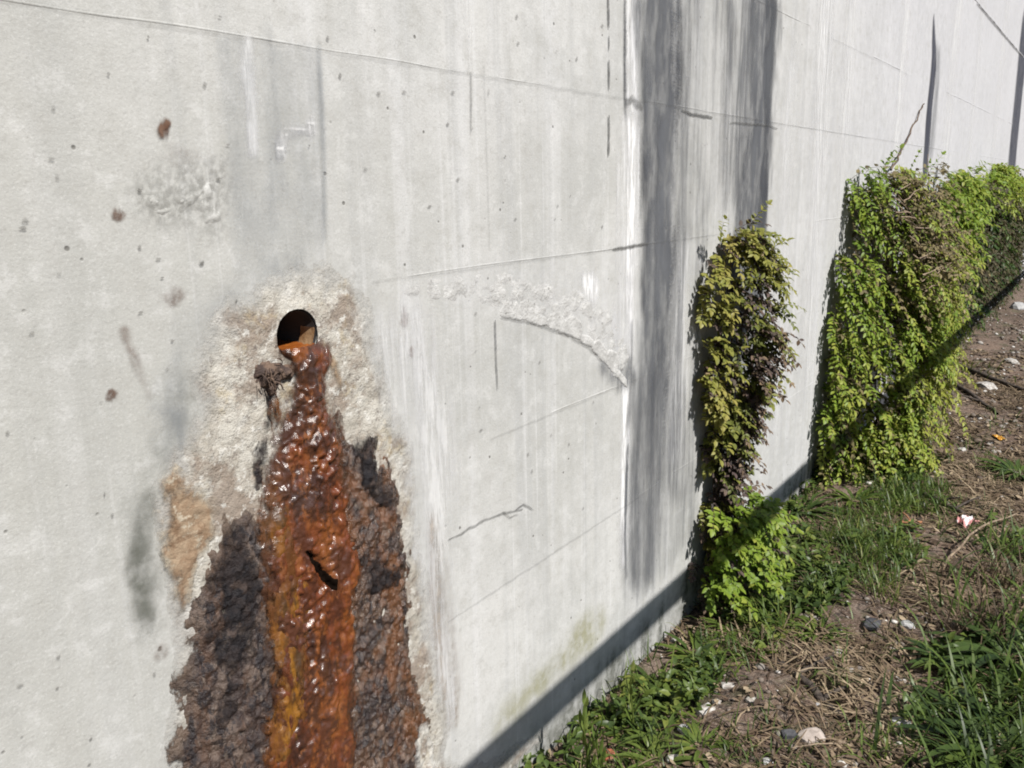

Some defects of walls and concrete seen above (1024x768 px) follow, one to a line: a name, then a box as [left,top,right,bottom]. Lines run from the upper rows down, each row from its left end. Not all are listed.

rust [158,119,171,137]
leakage [612,0,689,577]
leakage [728,0,777,349]
rust [157,266,451,768]
rust [473,730,545,768]